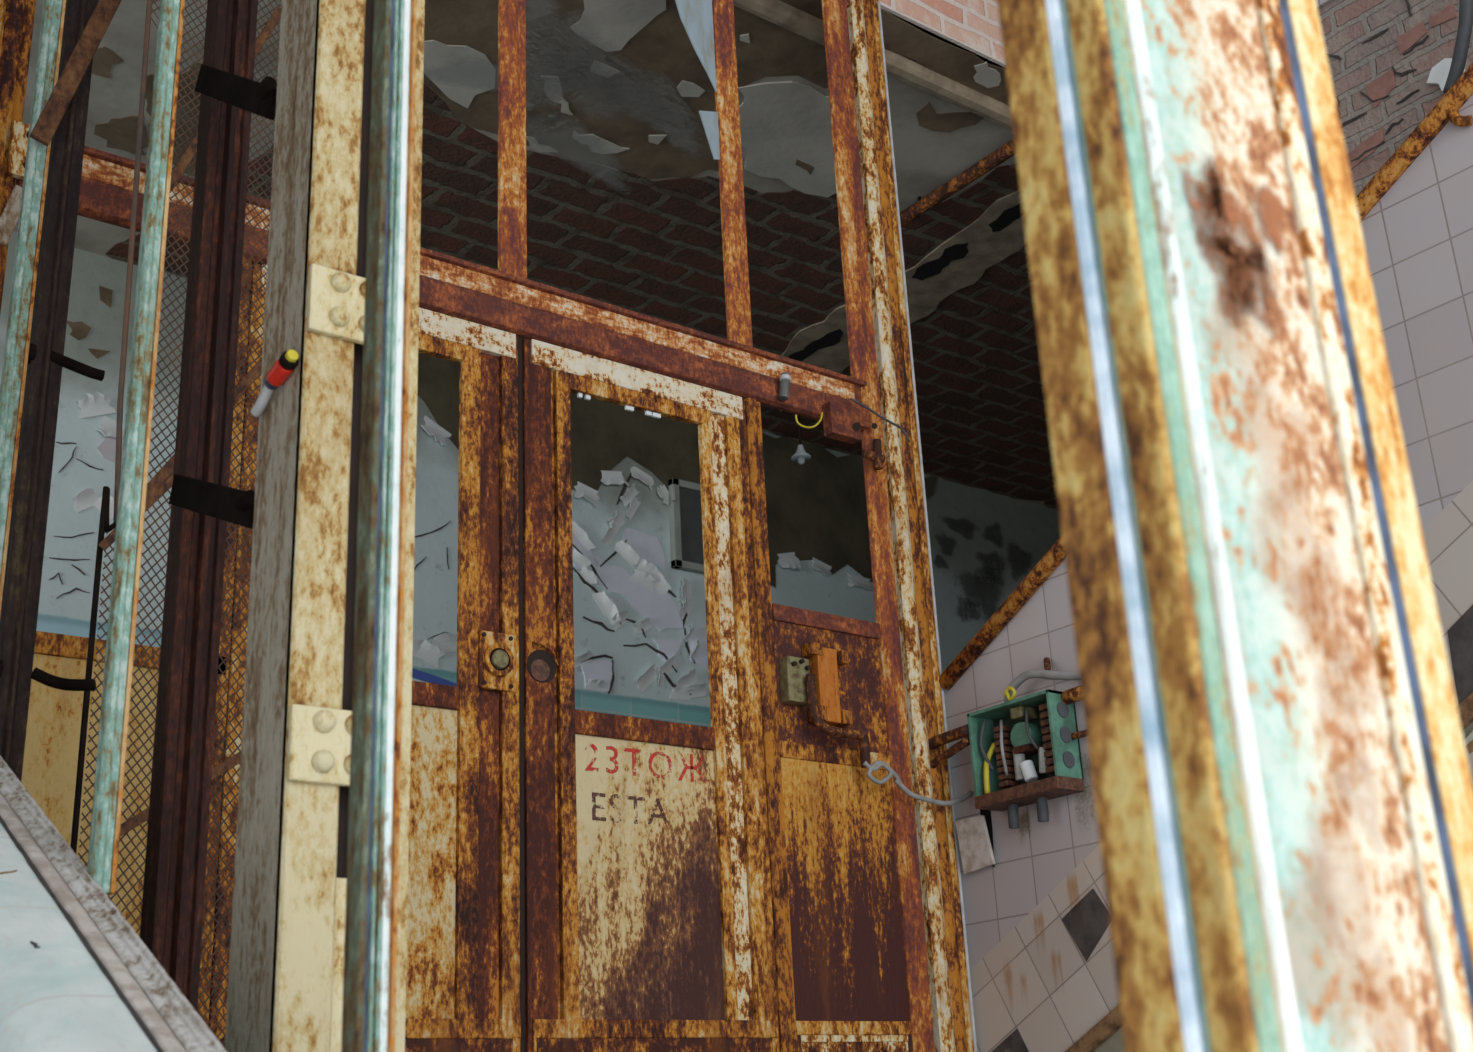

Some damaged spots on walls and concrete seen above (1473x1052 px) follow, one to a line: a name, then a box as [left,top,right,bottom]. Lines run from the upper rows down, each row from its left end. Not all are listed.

flaking render [105,234,141,265]
flaking render [94,74,154,155]
flaking render [172,62,203,177]
peeling [417,353,460,450]
flaking render [420,0,498,270]
flaking render [525,0,727,339]
flaking render [733,5,851,377]
flaking render [877,0,1010,106]
flaking render [901,163,1059,510]
corrosion [1184,157,1286,339]
peeling [760,405,873,590]
corrosion [530,659,550,681]